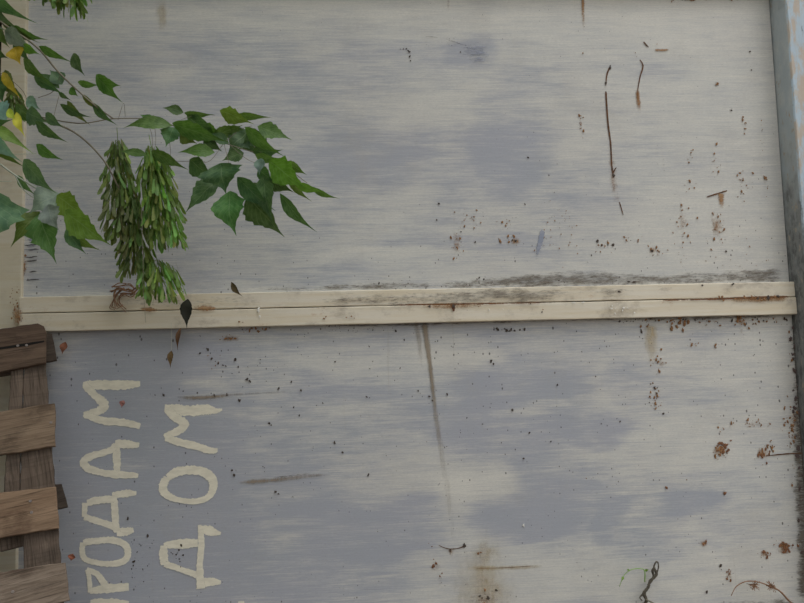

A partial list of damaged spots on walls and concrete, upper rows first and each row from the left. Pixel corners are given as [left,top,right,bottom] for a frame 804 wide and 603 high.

leakage [327,279,396,304]
leakage [435,269,776,303]
leakage [422,325,436,407]
corrosion [708,440,732,458]
corrosion [757,541,799,559]